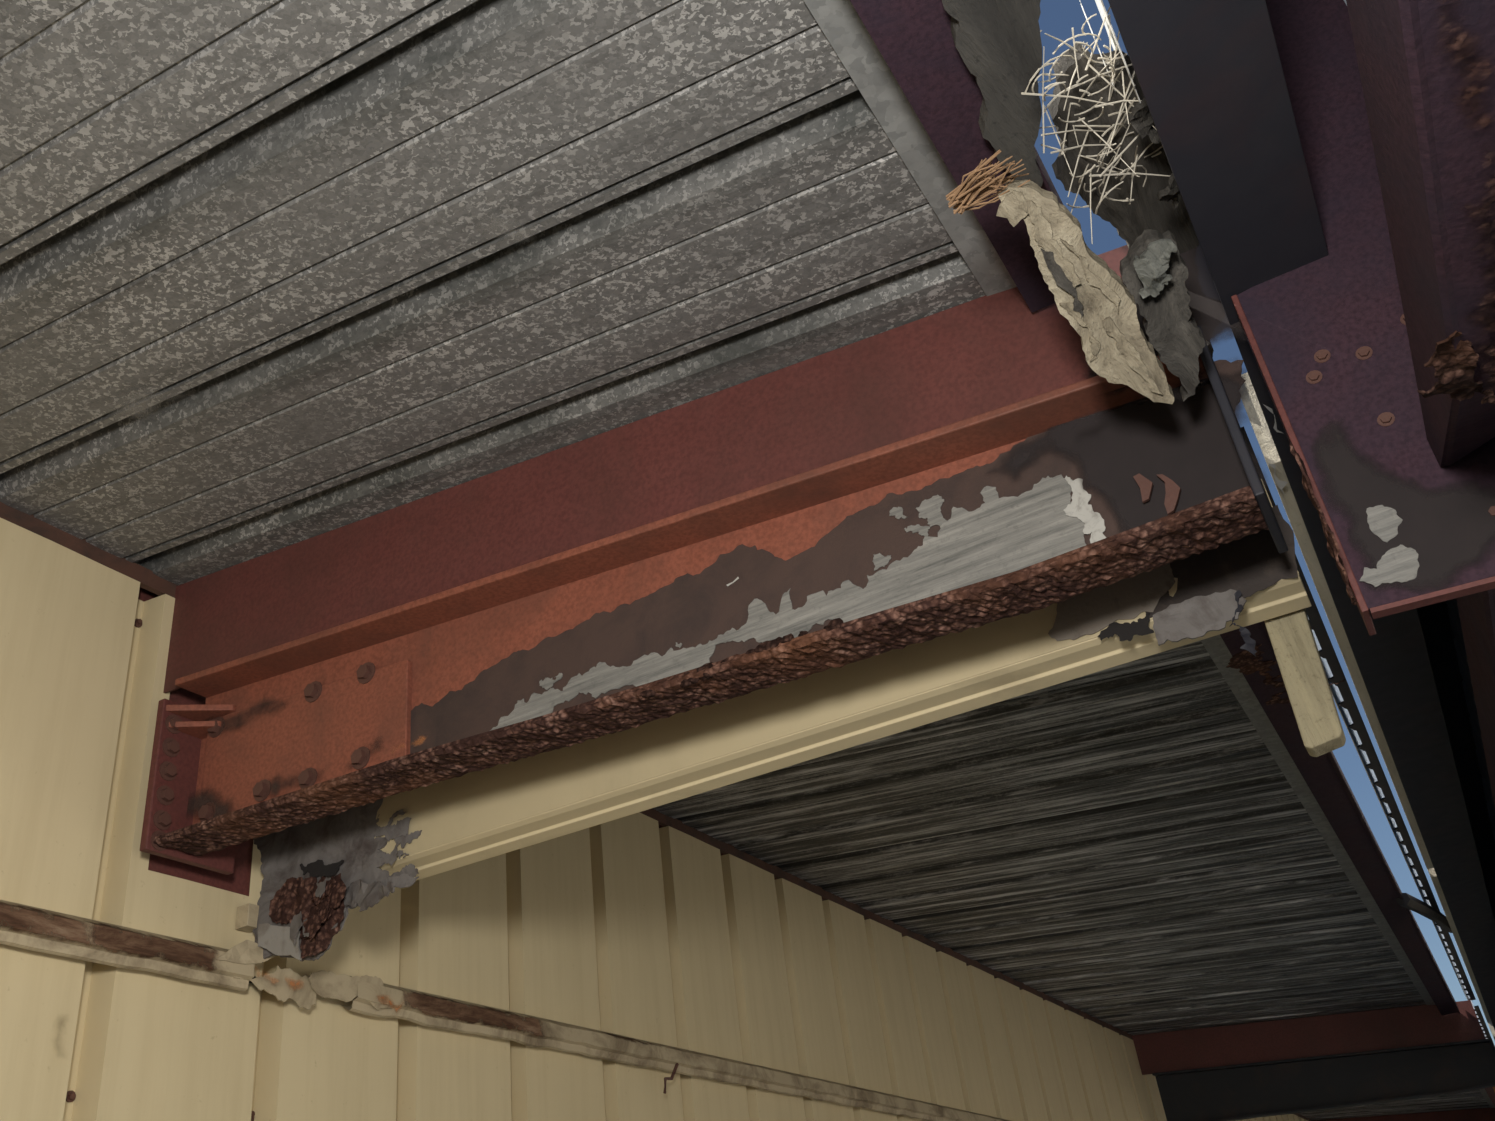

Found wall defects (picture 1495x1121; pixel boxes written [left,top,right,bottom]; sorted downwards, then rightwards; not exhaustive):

peeling [1214,360,1246,385]
peeling [1360,505,1419,587]
peeling [410,431,1122,754]
corrosion [1048,505,1298,716]
corrosion [290,873,346,945]